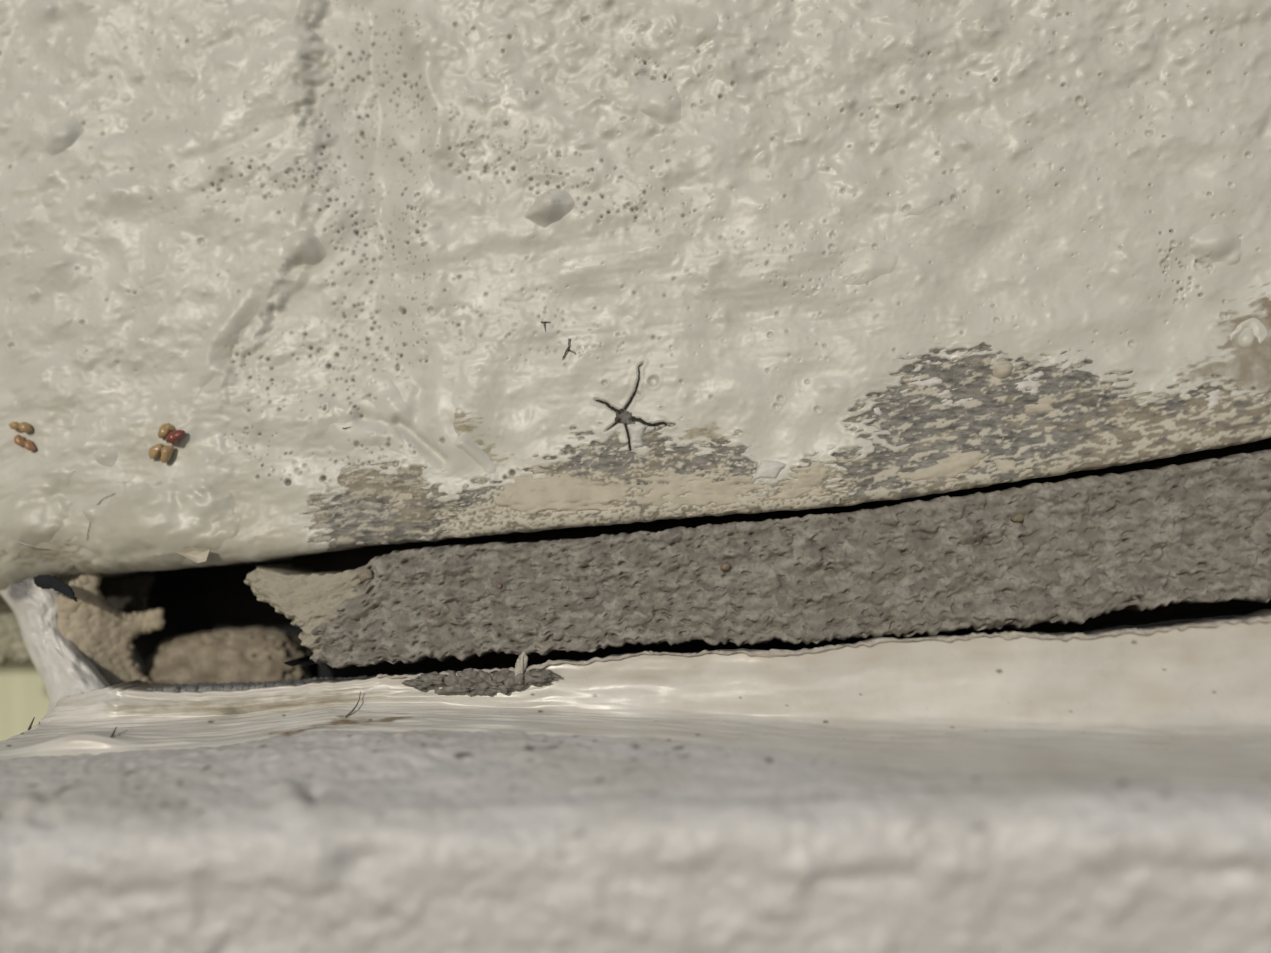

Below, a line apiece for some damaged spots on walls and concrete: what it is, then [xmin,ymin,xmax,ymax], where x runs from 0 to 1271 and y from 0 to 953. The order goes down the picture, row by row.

crack [292,438,1271,573]
peeling [304,342,1271,551]
spalling [0,547,303,715]
spalling [308,648,319,679]
crack [284,599,1271,678]